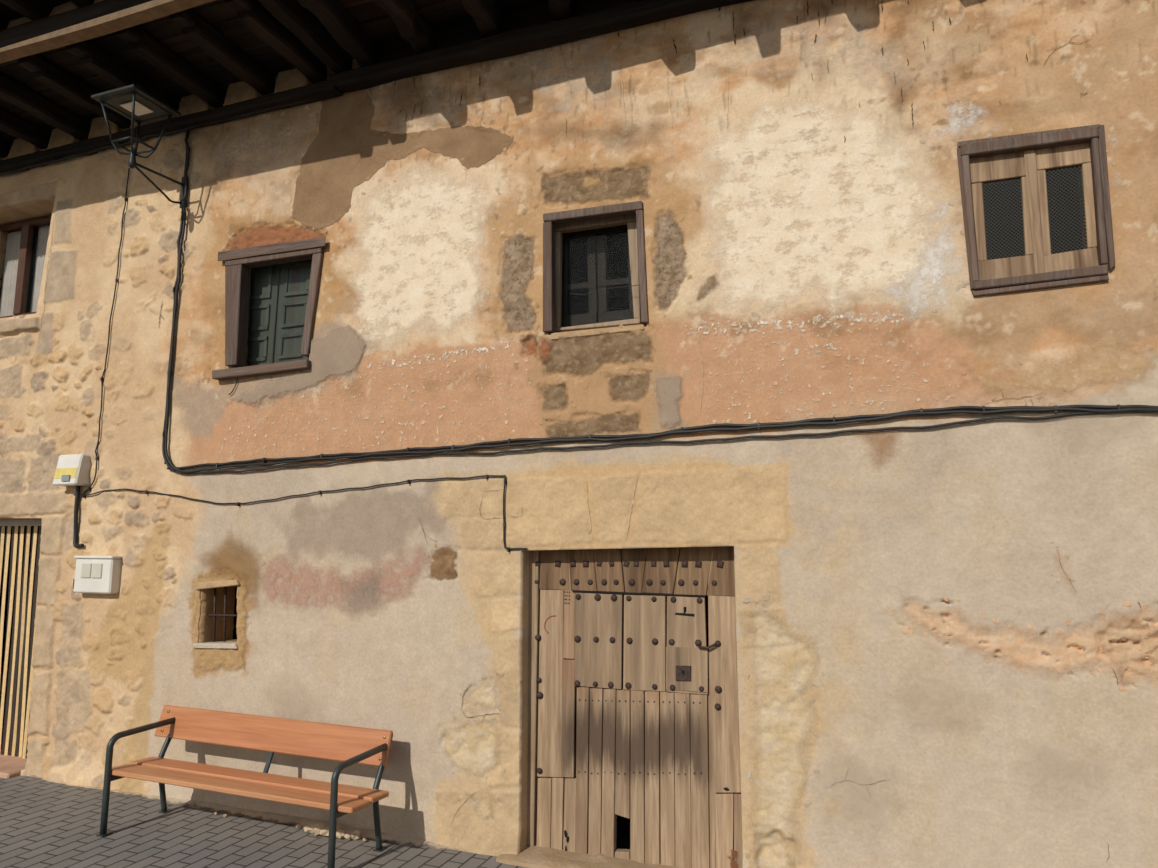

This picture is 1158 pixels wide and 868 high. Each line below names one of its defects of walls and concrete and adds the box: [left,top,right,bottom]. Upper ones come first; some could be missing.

peeling [944,103,993,138]
peeling [218,90,652,456]
peeling [652,102,970,428]
flaking render [427,543,457,580]
flaking render [876,597,1158,692]
flaking render [443,671,509,779]
flaking render [742,594,825,868]